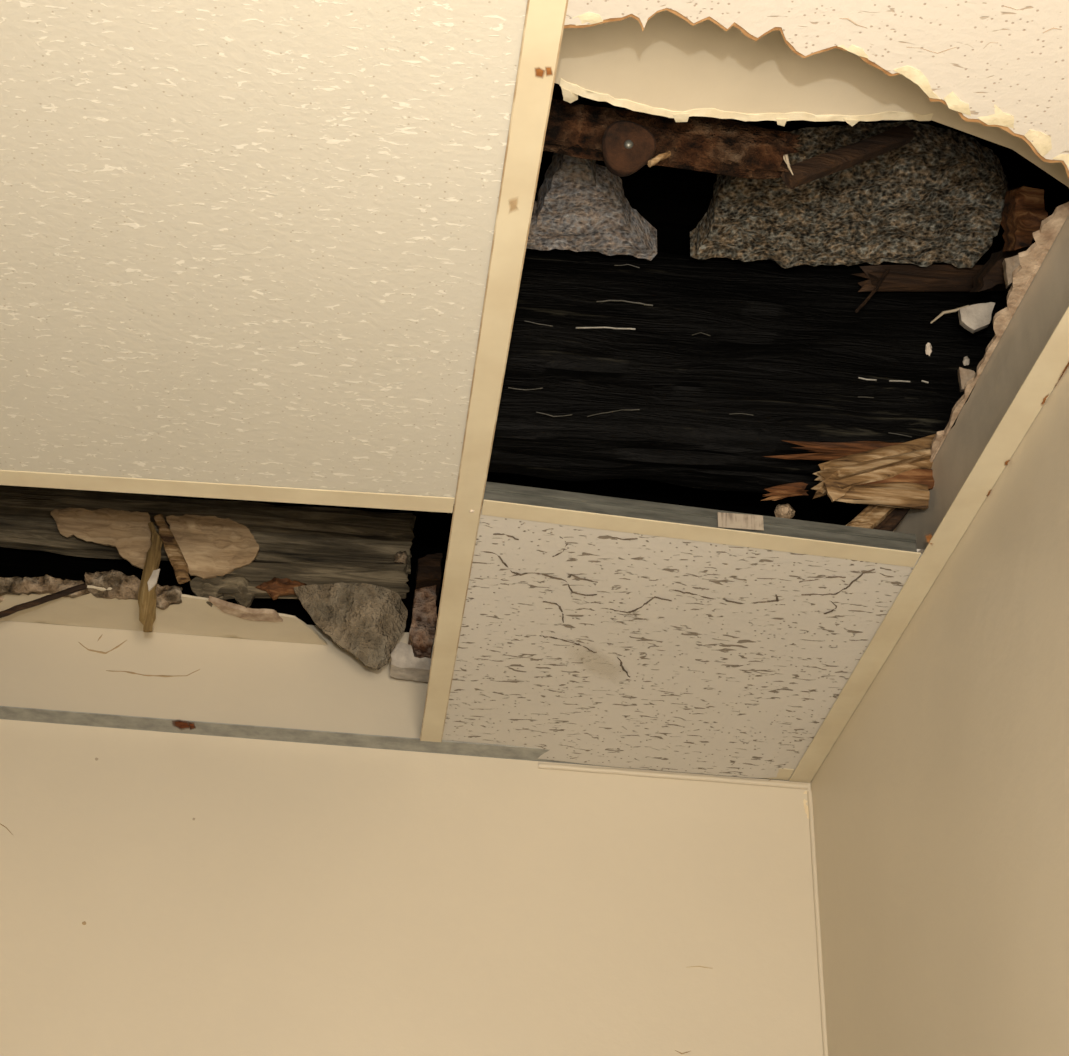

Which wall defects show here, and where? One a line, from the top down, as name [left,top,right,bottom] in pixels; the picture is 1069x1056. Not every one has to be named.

peeling [573,12,603,26]
peeling [837,44,869,59]
spalling [560,78,933,126]
peeling [894,65,1014,128]
peeling [1024,129,1069,167]
spalling [930,202,1069,462]
peeling [823,482,851,502]
spalling [0,585,328,645]
crack [481,533,875,677]
rust [173,720,196,730]